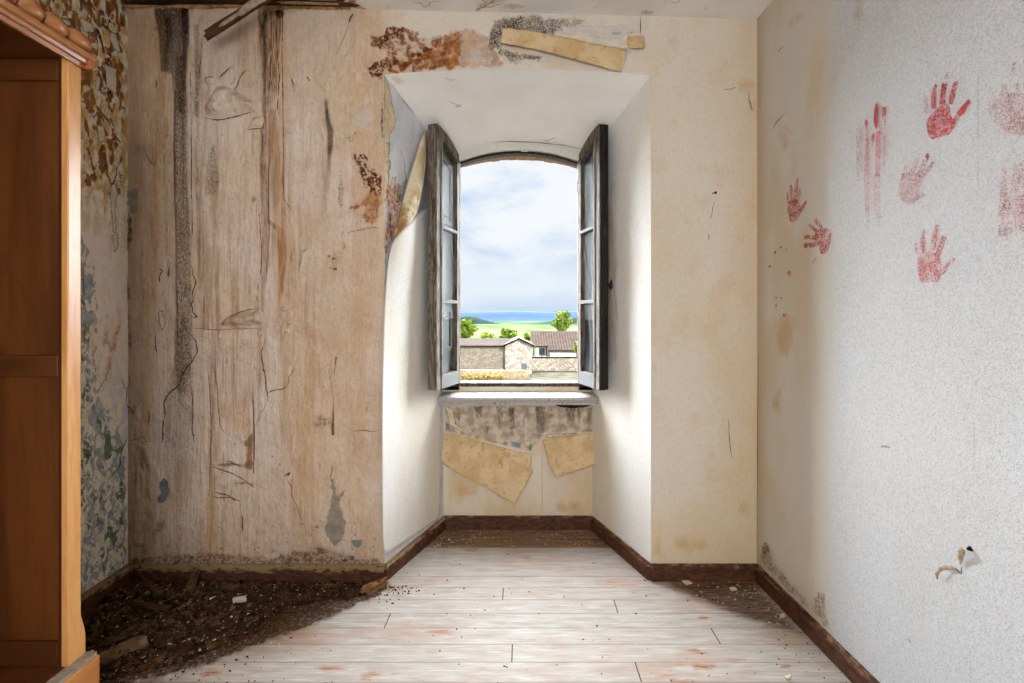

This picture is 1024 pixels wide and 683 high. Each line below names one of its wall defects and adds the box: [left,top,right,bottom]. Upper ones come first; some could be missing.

leakage [155,8,198,199]
peeling [384,79,396,201]
peeling [81,237,126,594]
crack [118,268,294,477]
flaking render [444,405,593,451]
spalling [156,477,170,504]
spalling [314,478,378,562]